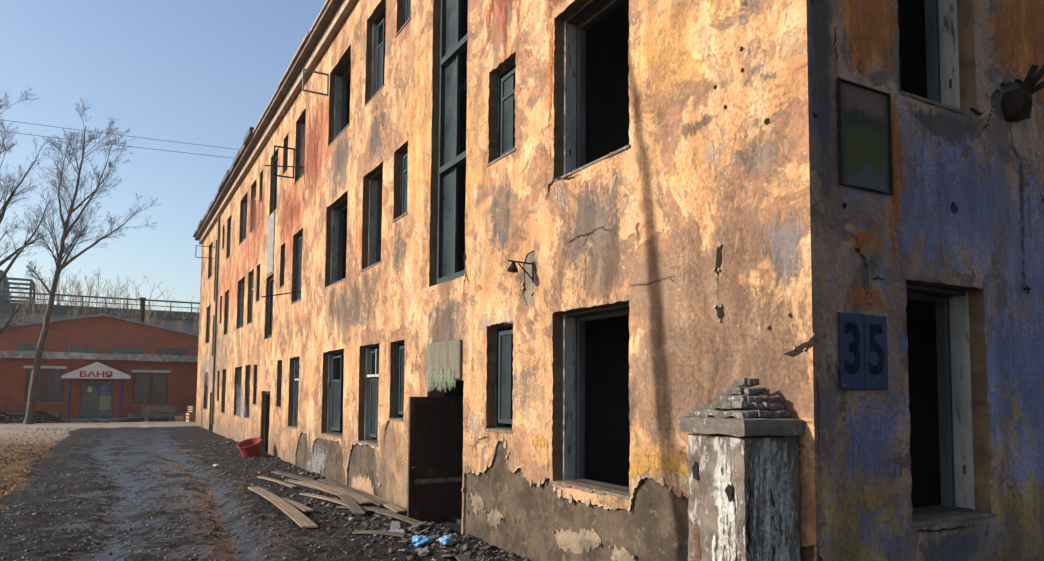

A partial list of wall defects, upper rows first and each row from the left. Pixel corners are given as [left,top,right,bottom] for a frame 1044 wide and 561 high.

rust [485,0,520,59]
flaking render [990,78,1021,119]
crack [569,222,639,246]
flaking render [295,432,382,498]
flaking render [461,437,689,561]
peeling [712,460,737,561]
peeling [753,456,826,561]